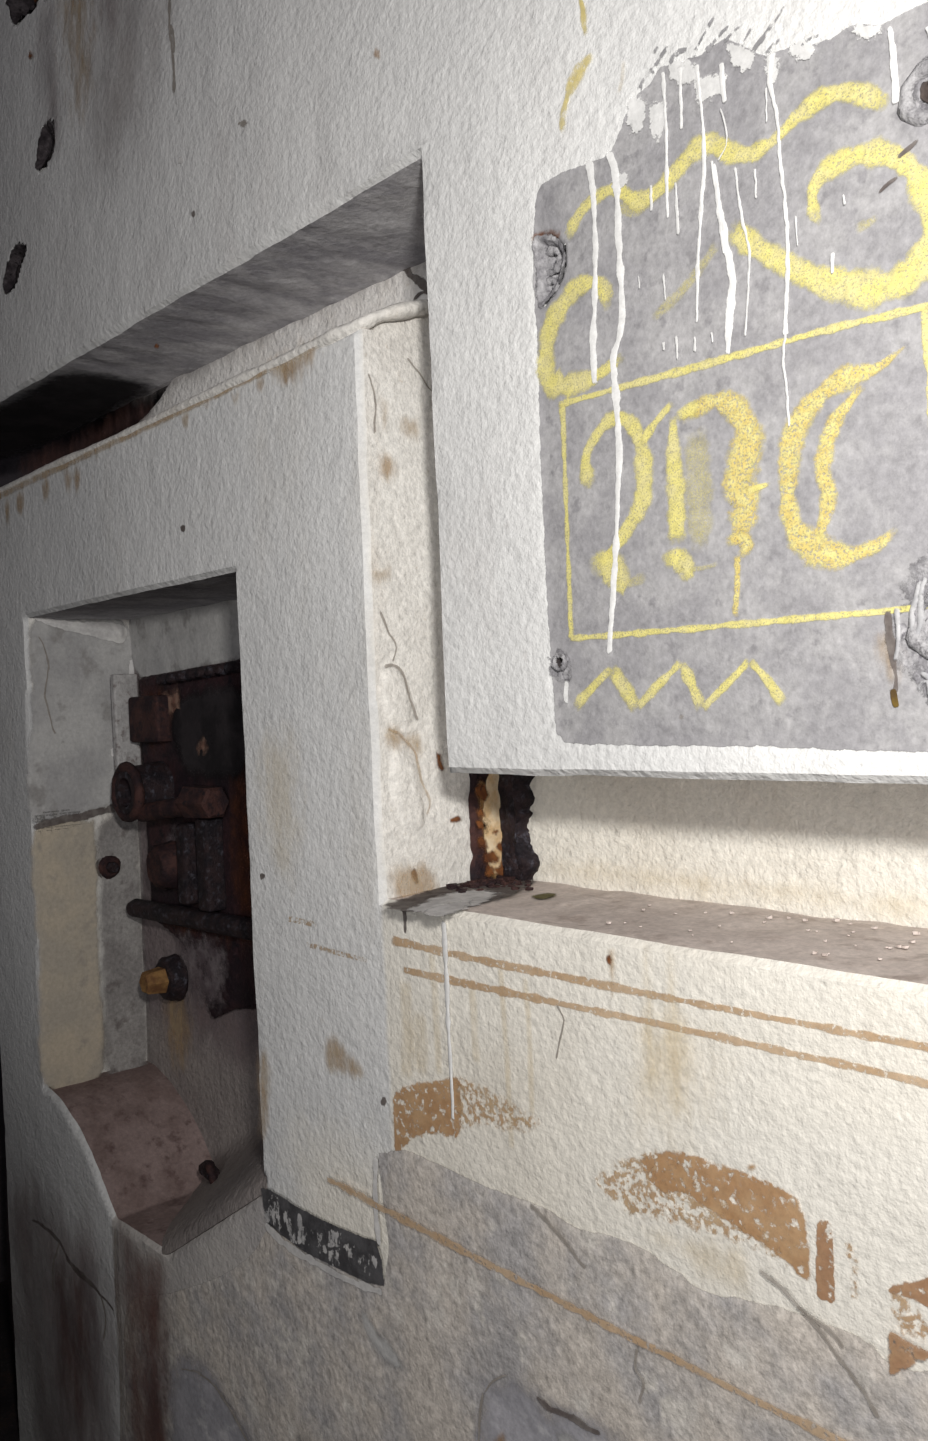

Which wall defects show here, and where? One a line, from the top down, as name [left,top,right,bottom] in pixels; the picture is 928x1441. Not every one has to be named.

spalling [5,0,38,24]
peeling [532,2,928,752]
corrosion [232,772,252,916]
flaking render [123,1150,928,1441]